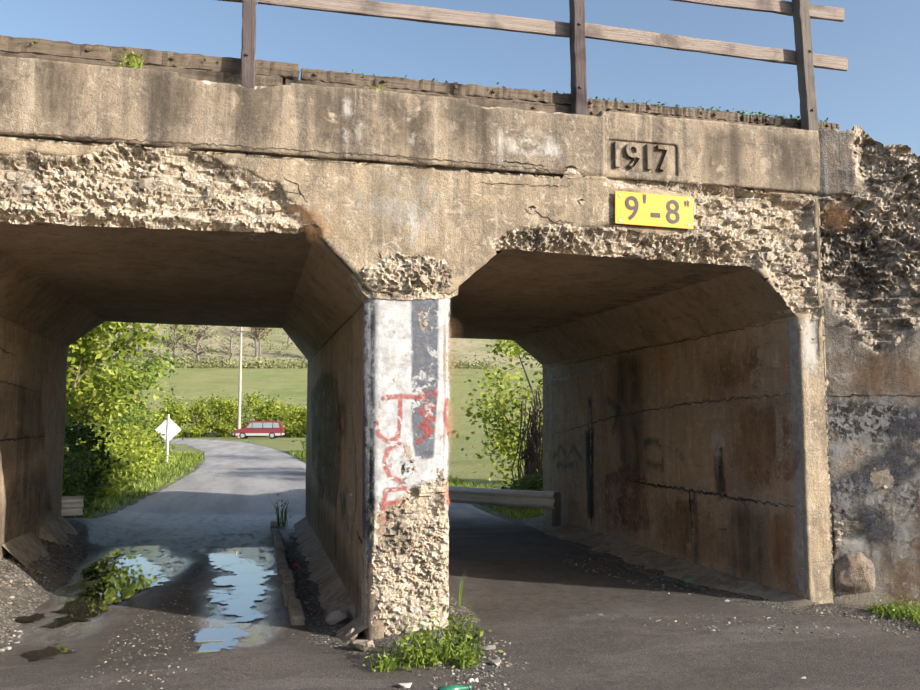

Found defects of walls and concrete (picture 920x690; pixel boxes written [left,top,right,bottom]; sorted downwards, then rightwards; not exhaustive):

spalling [0,139,321,241]
crack [1,131,600,187]
spalling [493,125,920,364]
crack [557,393,790,433]
spalling [361,440,449,638]
crack [625,479,795,532]